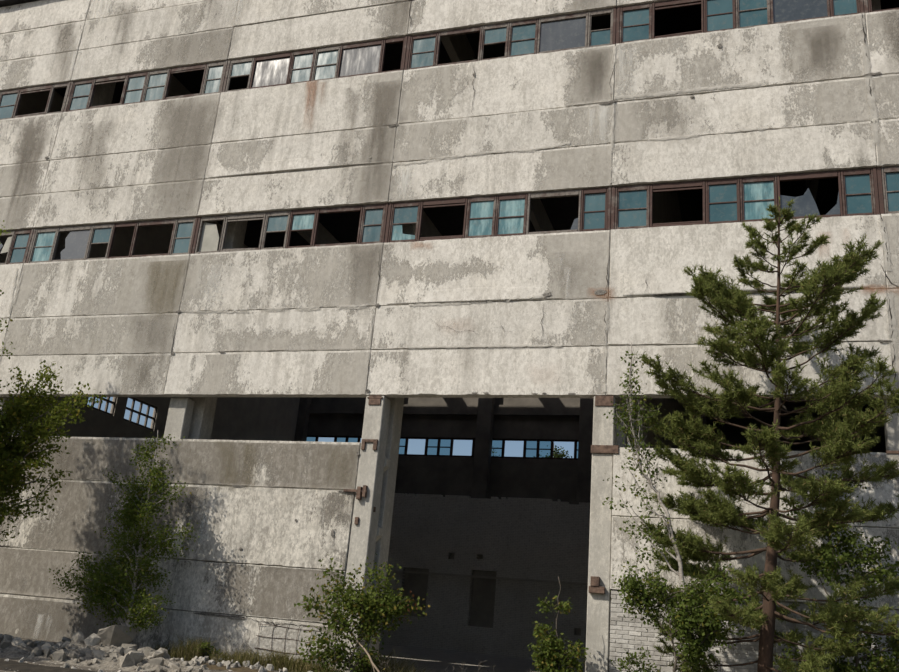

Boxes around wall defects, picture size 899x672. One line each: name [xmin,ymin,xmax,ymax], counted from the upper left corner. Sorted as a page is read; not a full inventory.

crack [861,16,872,96]
damp [20,126,44,180]
damp [373,85,397,154]
crack [880,213,899,381]
peeling [0,438,359,669]